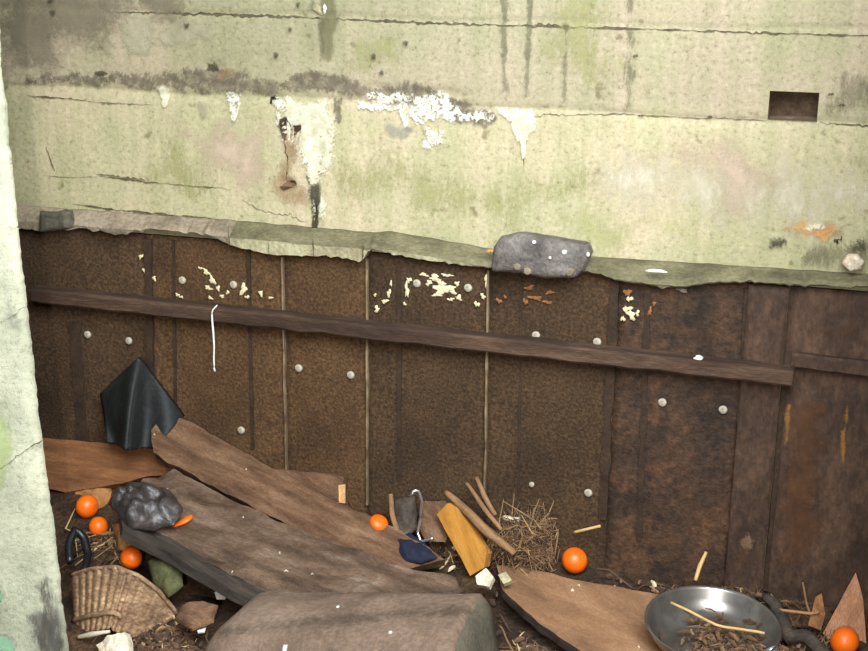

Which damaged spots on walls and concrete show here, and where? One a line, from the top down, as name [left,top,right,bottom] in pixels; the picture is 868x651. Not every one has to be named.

damp [0,0,129,65]
damp [320,0,337,55]
efflorescence [355,90,537,162]
crack [535,113,763,121]
corrosion [796,222,829,240]